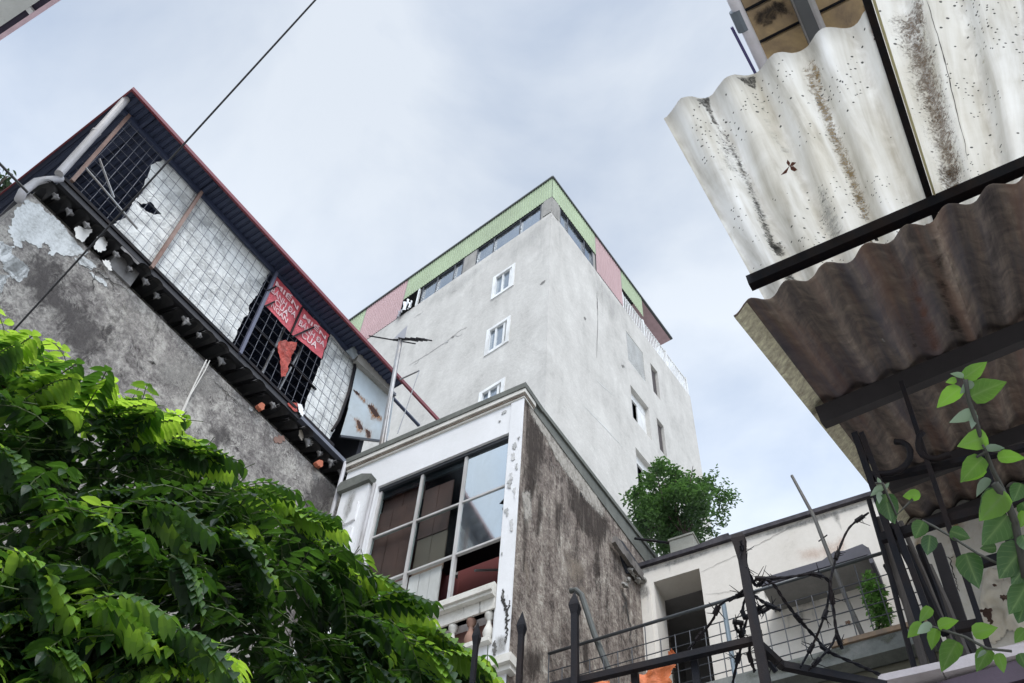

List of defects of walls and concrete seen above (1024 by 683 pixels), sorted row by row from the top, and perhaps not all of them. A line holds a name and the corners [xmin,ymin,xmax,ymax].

leakage [939,167,959,190]
peeling [0,200,109,293]
leakage [769,242,784,256]
rust [354,390,382,438]
peeling [504,436,532,531]
leakage [524,413,545,536]
peeling [529,407,603,515]
leakage [556,485,608,575]
crack [501,589,510,642]
leakage [525,652,543,679]